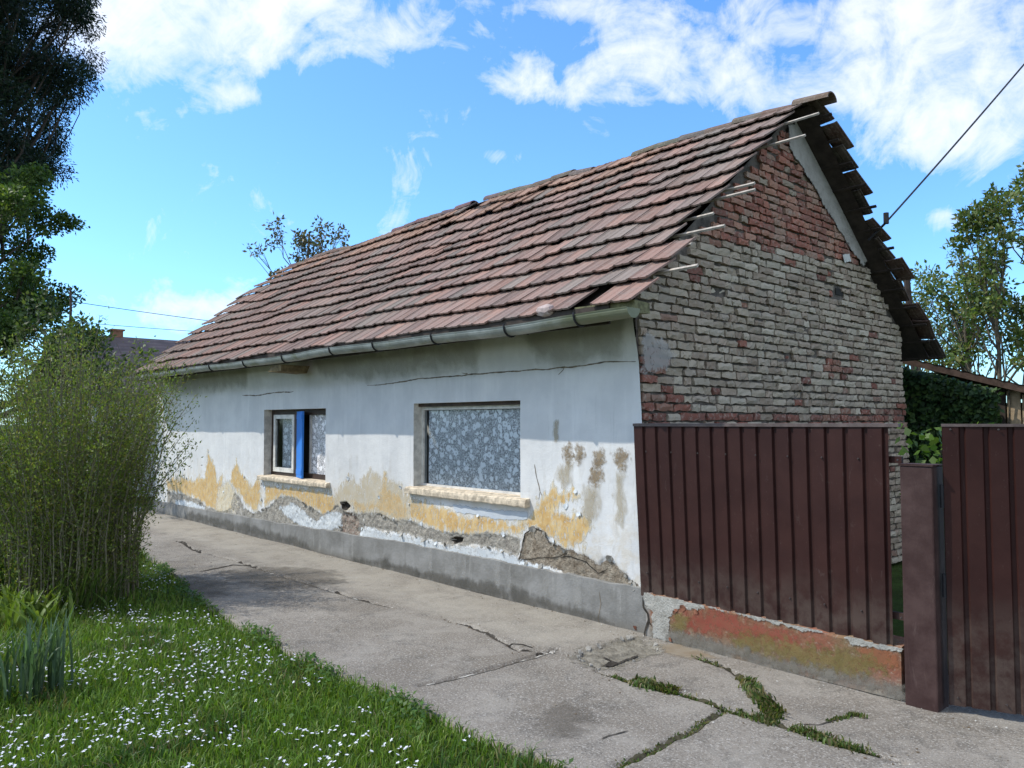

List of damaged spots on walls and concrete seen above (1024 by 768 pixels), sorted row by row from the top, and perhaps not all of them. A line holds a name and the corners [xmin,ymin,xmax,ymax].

crack [367,361,636,386]
water stain [554,421,628,522]
crack [176,541,392,608]
spalling [166,449,827,671]
crack [425,623,556,686]
crack [598,597,881,768]
spalling [844,636,903,652]